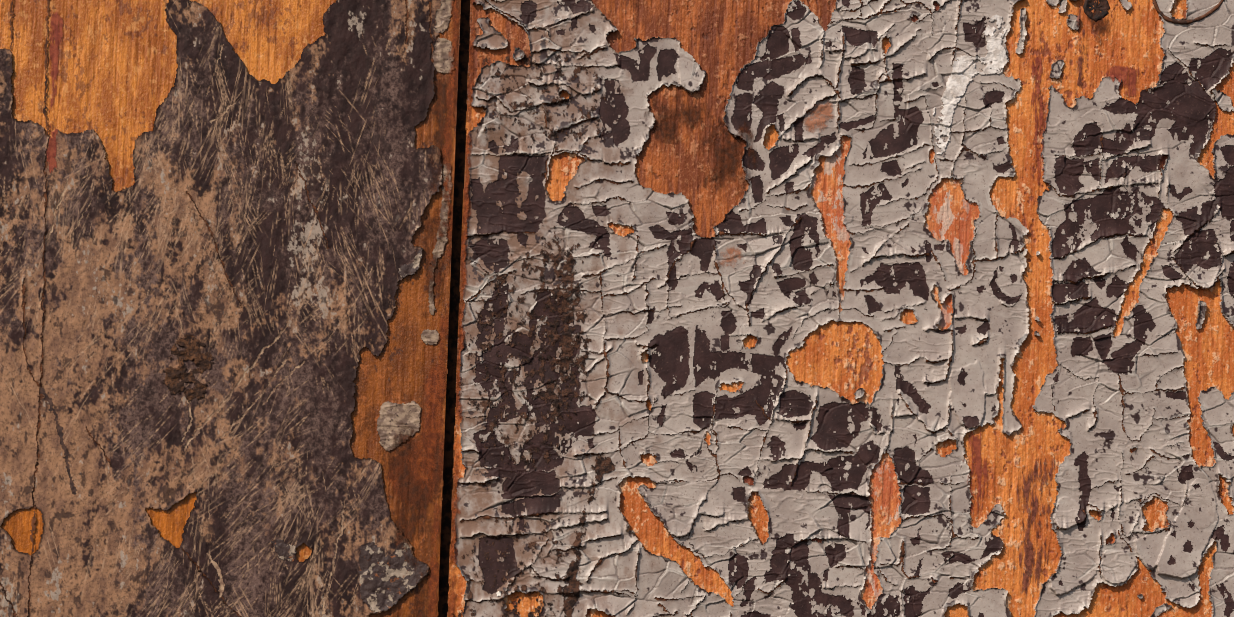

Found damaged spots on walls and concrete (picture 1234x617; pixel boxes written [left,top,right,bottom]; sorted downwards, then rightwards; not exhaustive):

peeling [0,0,178,192]
peeling [190,0,336,84]
crack [1168,43,1232,91]
crack [1052,134,1169,202]
crack [460,0,1024,617]
peeling [349,0,1234,617]
crack [1053,233,1146,335]
crack [1171,208,1234,290]
crack [1051,331,1189,577]